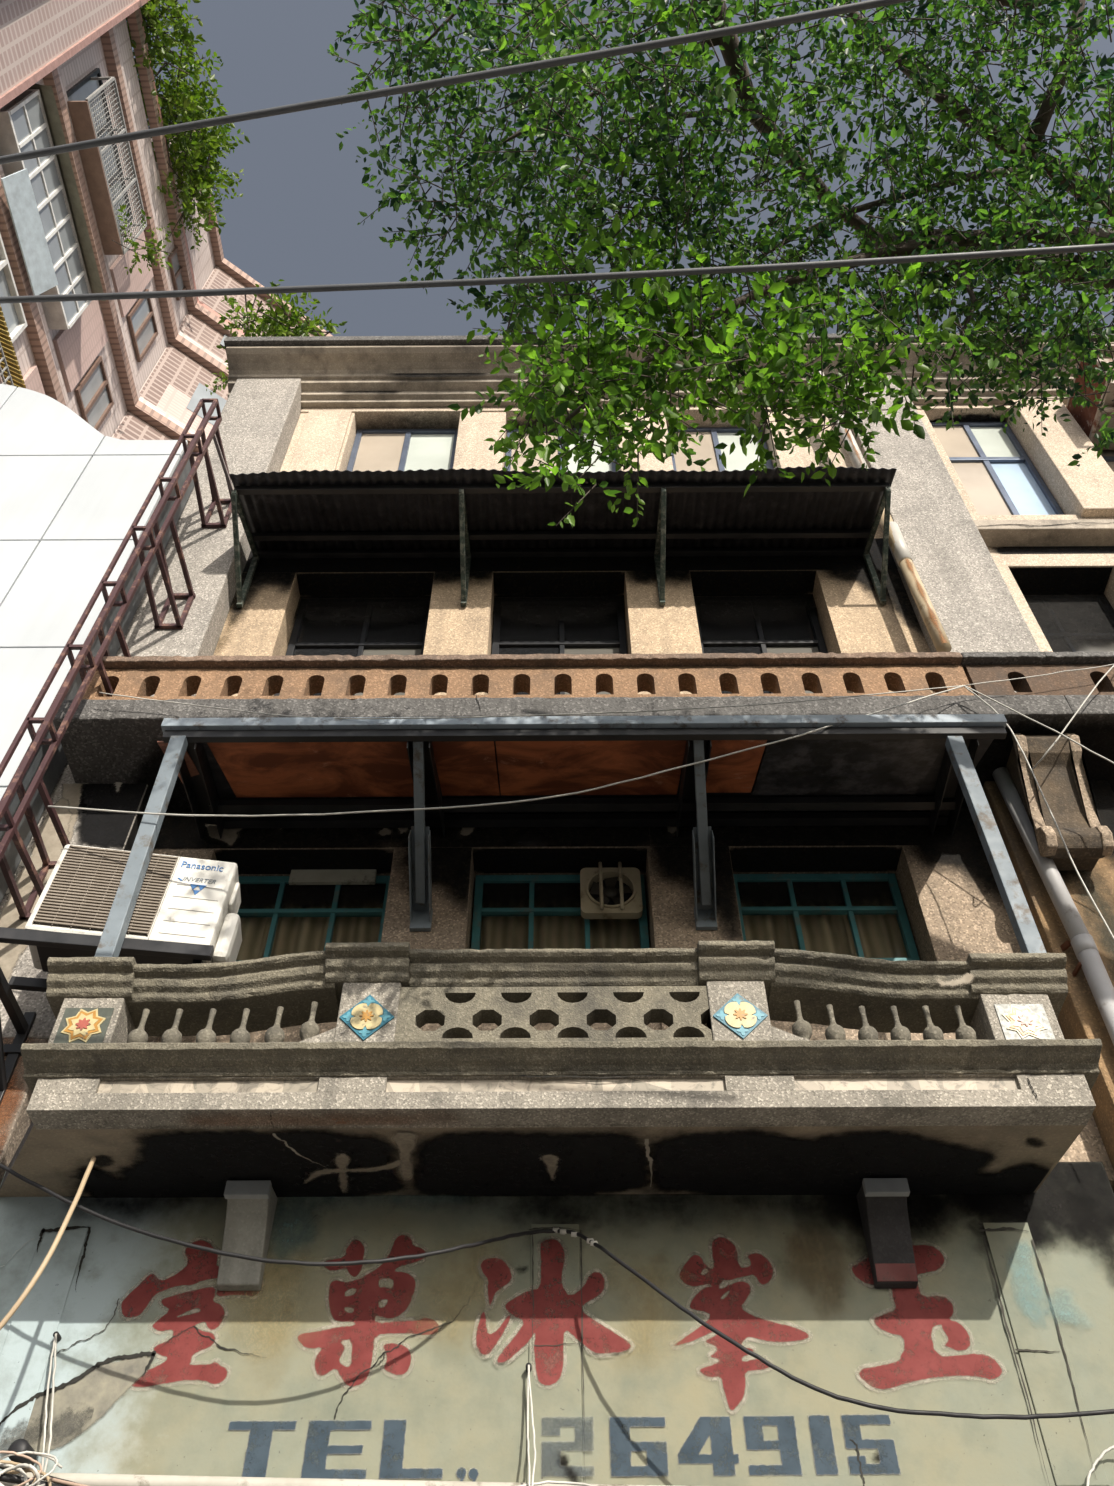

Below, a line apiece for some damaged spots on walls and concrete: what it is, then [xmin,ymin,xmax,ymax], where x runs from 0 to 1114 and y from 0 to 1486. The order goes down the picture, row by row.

corrosion [0,1037,31,1146]
crack [37,1226,91,1290]
water stain [979,1216,1048,1248]
water stain [1077,1206,1114,1269]
crack [0,1298,267,1425]